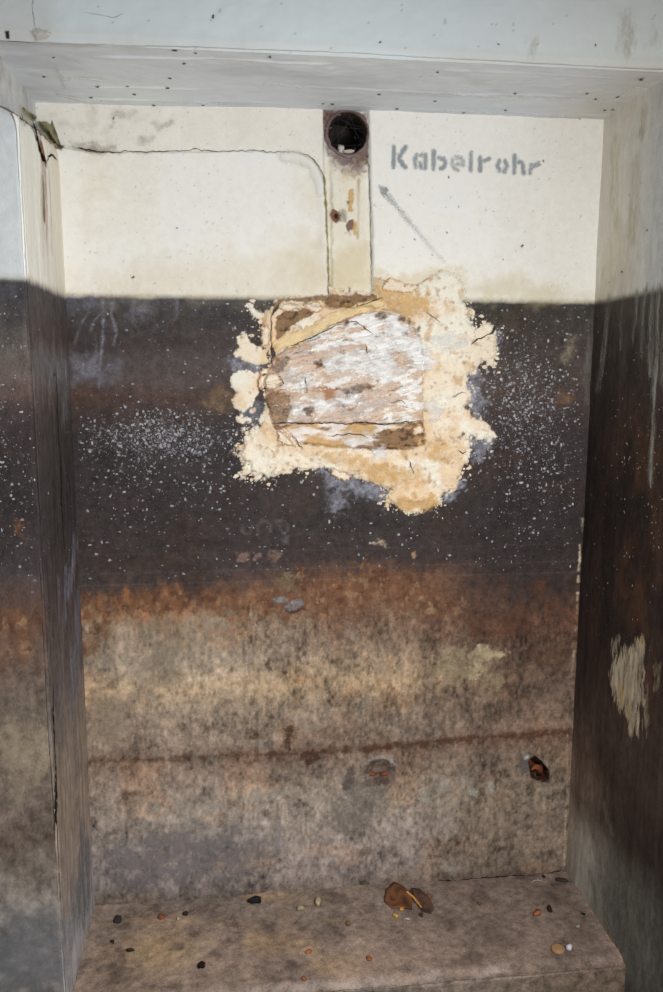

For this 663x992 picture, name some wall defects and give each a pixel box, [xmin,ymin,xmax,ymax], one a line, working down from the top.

crack [21,107,326,186]
corrosion [323,110,336,131]
corrosion [327,146,368,234]
flaking render [230,269,508,519]
water stain [635,286,660,486]
corrosion [258,559,463,626]
peeling [610,635,647,737]
crack [51,683,59,825]
spalling [520,755,549,782]